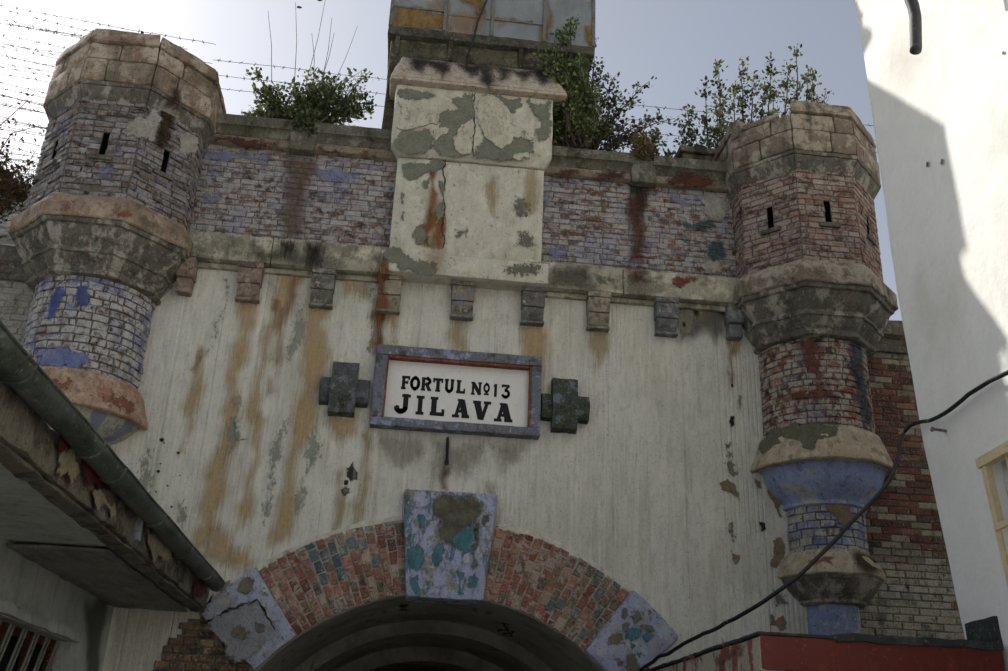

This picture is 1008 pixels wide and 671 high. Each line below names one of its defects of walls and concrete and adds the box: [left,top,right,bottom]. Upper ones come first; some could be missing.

rust [393,7,448,29]
peeling [126,107,162,142]
peeling [393,88,554,224]
crack [470,94,478,157]
water stain [261,158,327,267]
rust [423,171,445,247]
crack [439,159,447,247]
water stain [553,186,661,288]
rust [370,256,396,354]
peeling [758,422,838,453]
peeling [407,492,490,595]
crack [200,594,275,629]